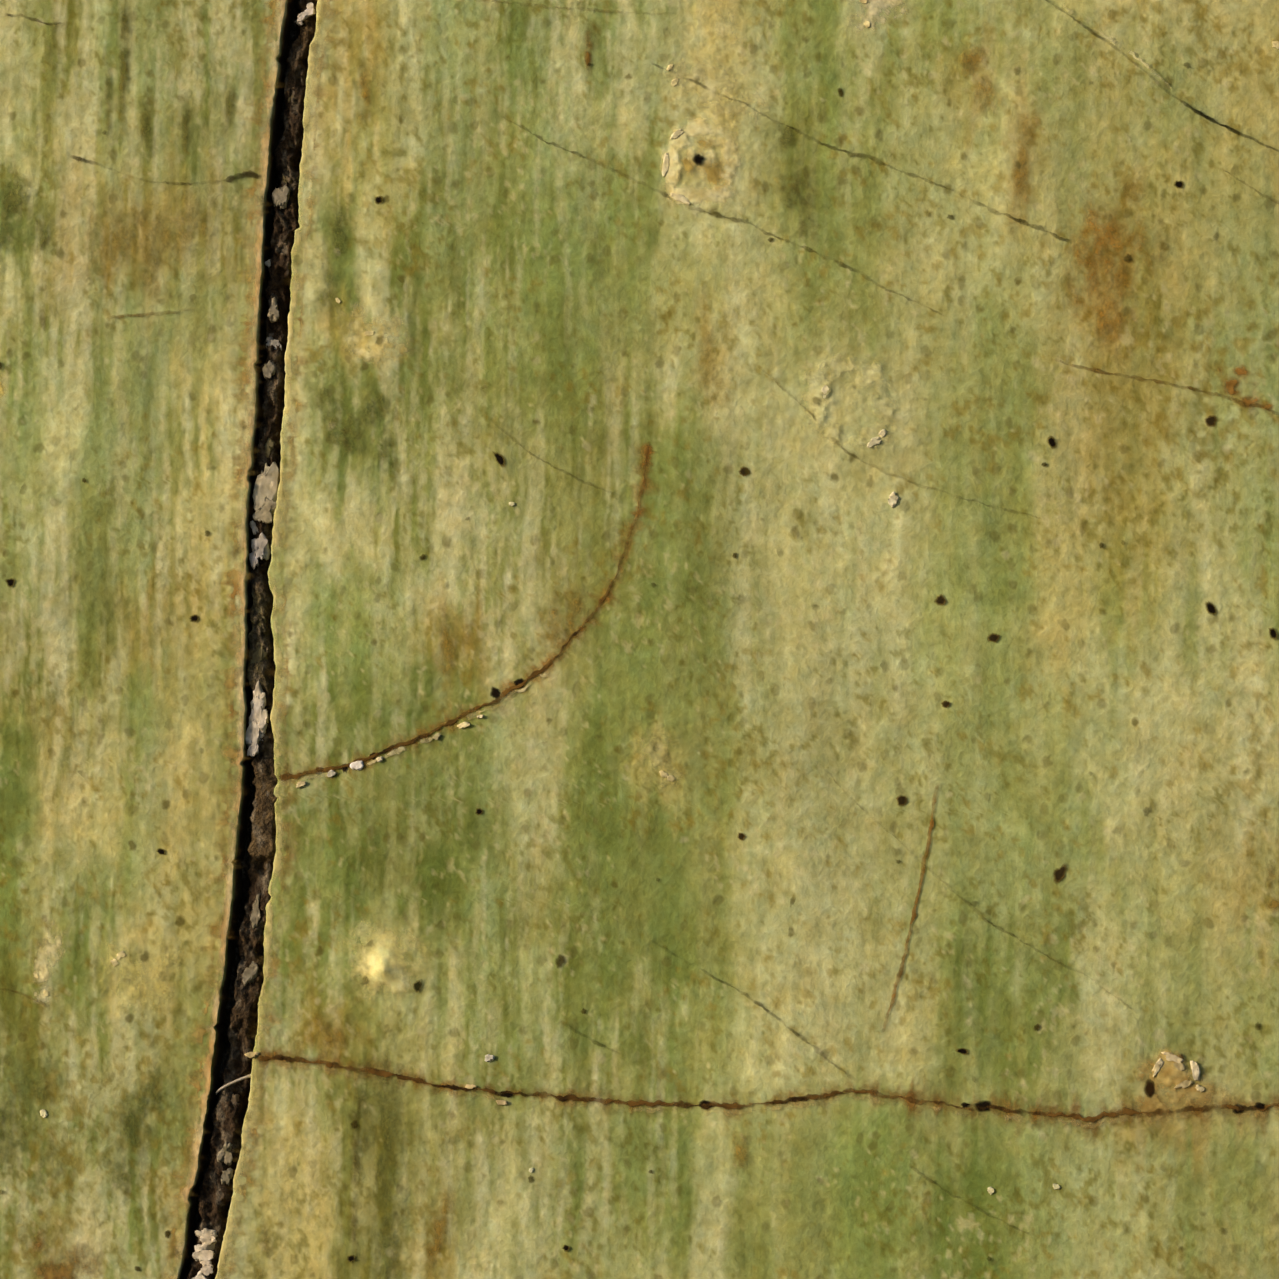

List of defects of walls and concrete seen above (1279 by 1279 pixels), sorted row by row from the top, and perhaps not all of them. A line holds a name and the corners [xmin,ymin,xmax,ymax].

crack [1068,9,1240,135]
crack [179,0,1171,1279]
crack [1185,1098,1279,1117]